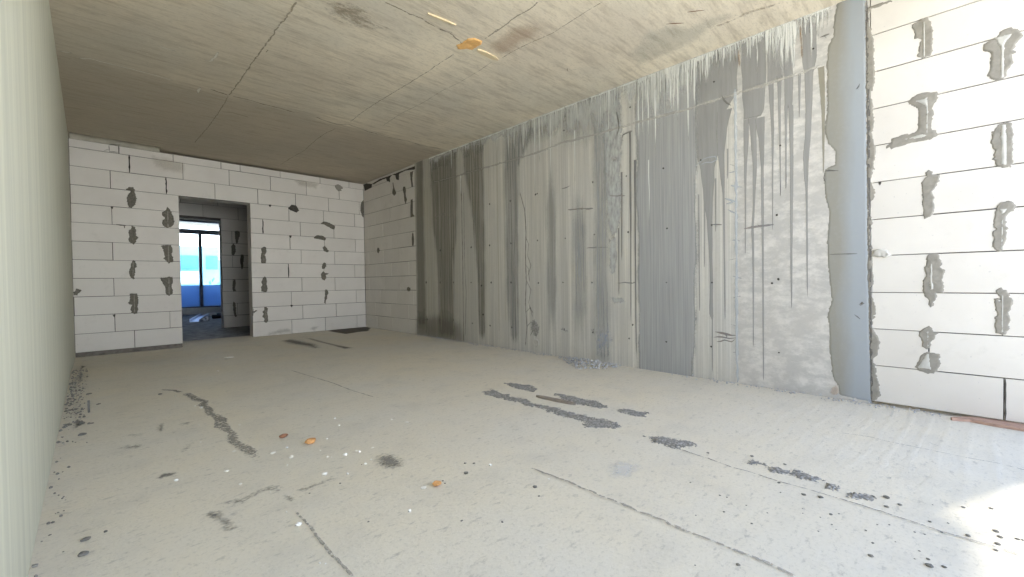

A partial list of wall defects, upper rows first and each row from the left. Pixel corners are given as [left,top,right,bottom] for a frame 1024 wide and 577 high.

crack [520,194,533,345]
damp [425,7,830,379]